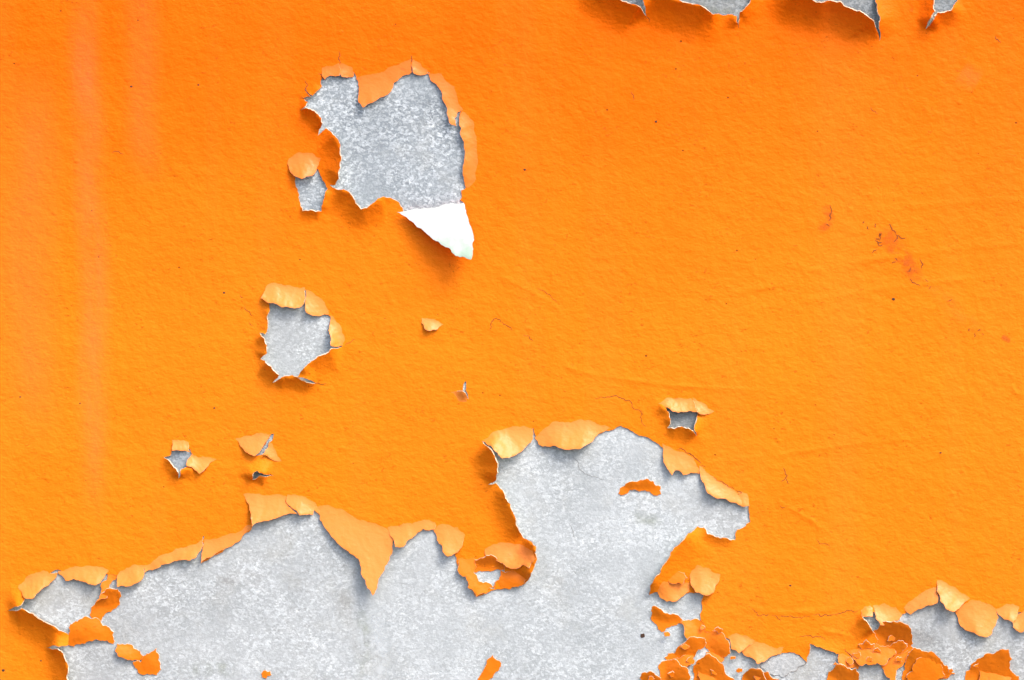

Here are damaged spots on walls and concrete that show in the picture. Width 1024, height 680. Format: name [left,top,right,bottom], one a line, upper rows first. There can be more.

peeling [680,0,750,22]
peeling [815,0,880,39]
peeling [926,0,957,28]
peeling [287,59,478,260]
peeling [261,283,345,383]
peeling [422,318,443,331]
peeling [659,398,714,431]
peeling [11,419,1024,680]